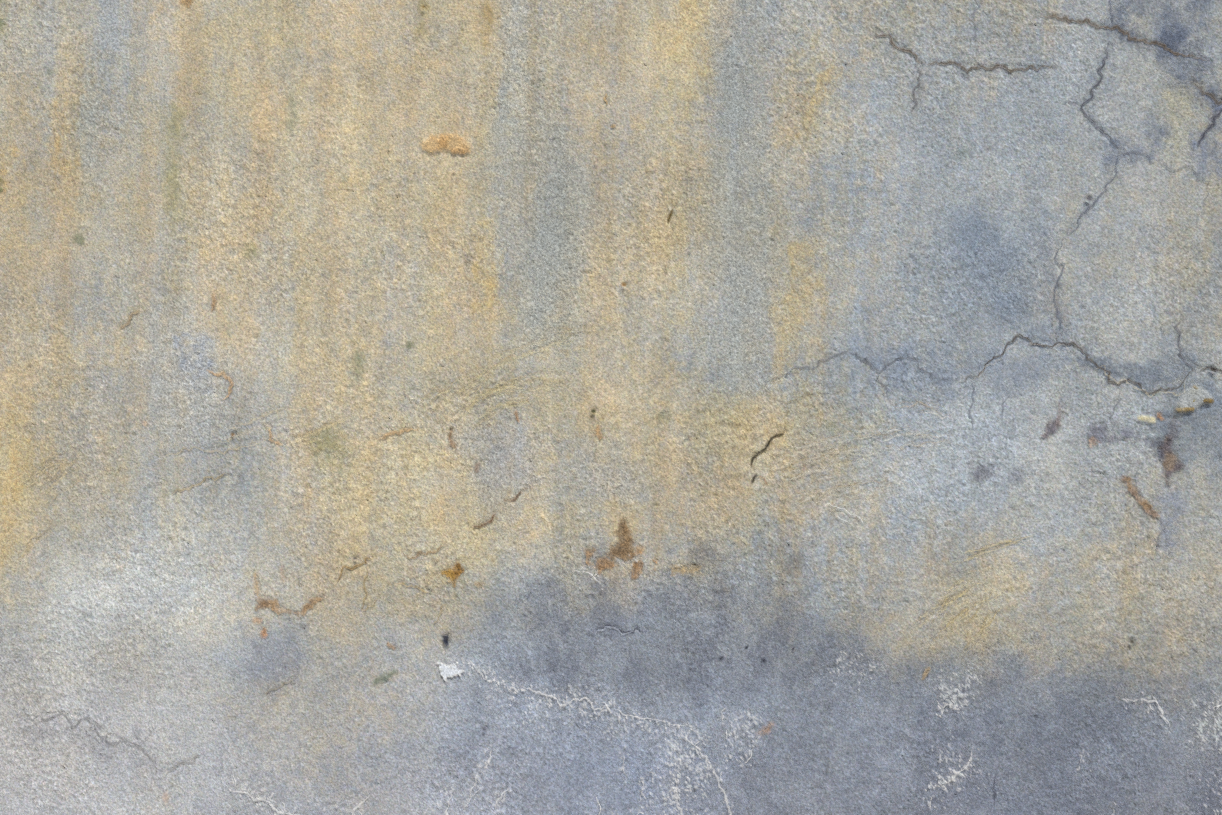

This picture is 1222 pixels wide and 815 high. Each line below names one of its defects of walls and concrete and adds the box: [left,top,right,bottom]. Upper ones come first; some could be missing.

crack [876,33,1042,105]
crack [1049,12,1194,137]
crack [1199,87,1222,143]
crack [971,254,1221,418]
water stain [437,662,463,681]